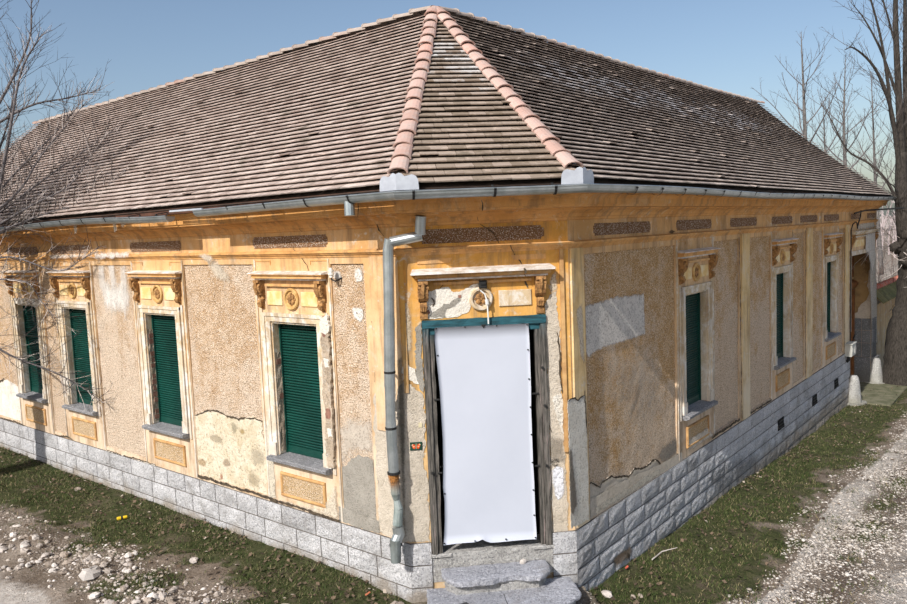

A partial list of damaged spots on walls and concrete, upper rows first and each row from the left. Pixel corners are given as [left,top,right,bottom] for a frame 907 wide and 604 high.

flaking render [401,283,479,394]
flaking render [194,410,276,498]
flaking render [275,352,287,451]
peeling [290,488,338,518]
flaking render [373,393,394,537]
flaking render [553,394,713,528]